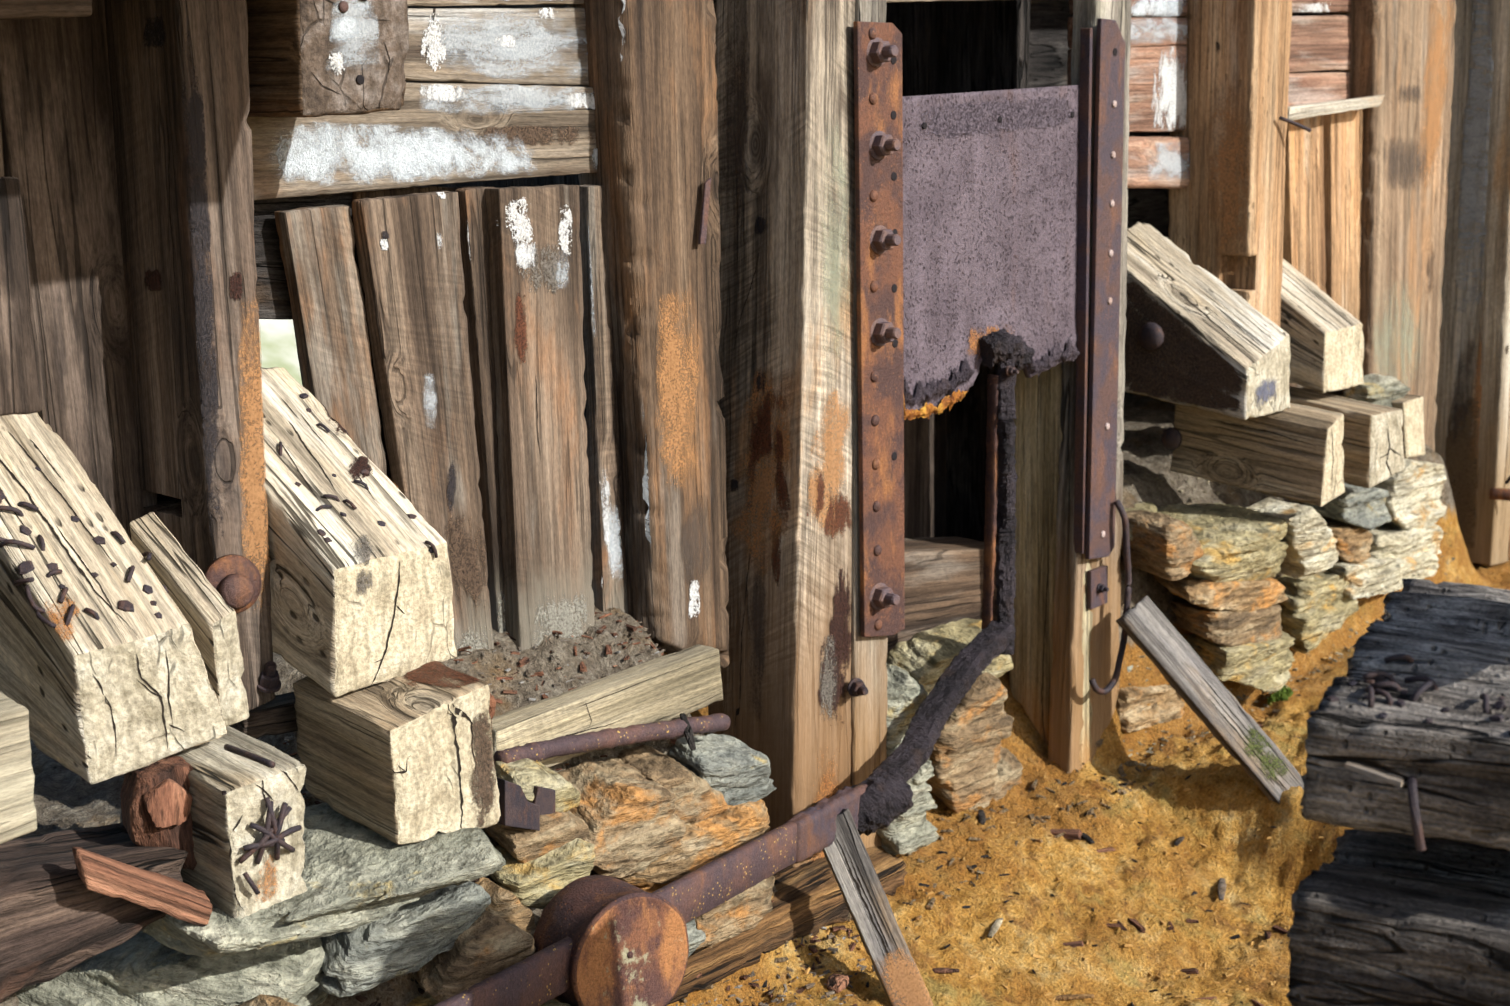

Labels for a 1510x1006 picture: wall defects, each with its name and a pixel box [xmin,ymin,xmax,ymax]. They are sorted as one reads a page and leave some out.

water stain [329,0,378,75]
water stain [420,0,595,109]
water stain [1131,0,1189,177]
water stain [277,123,598,199]
water stain [380,231,389,250]
water stain [497,197,592,363]